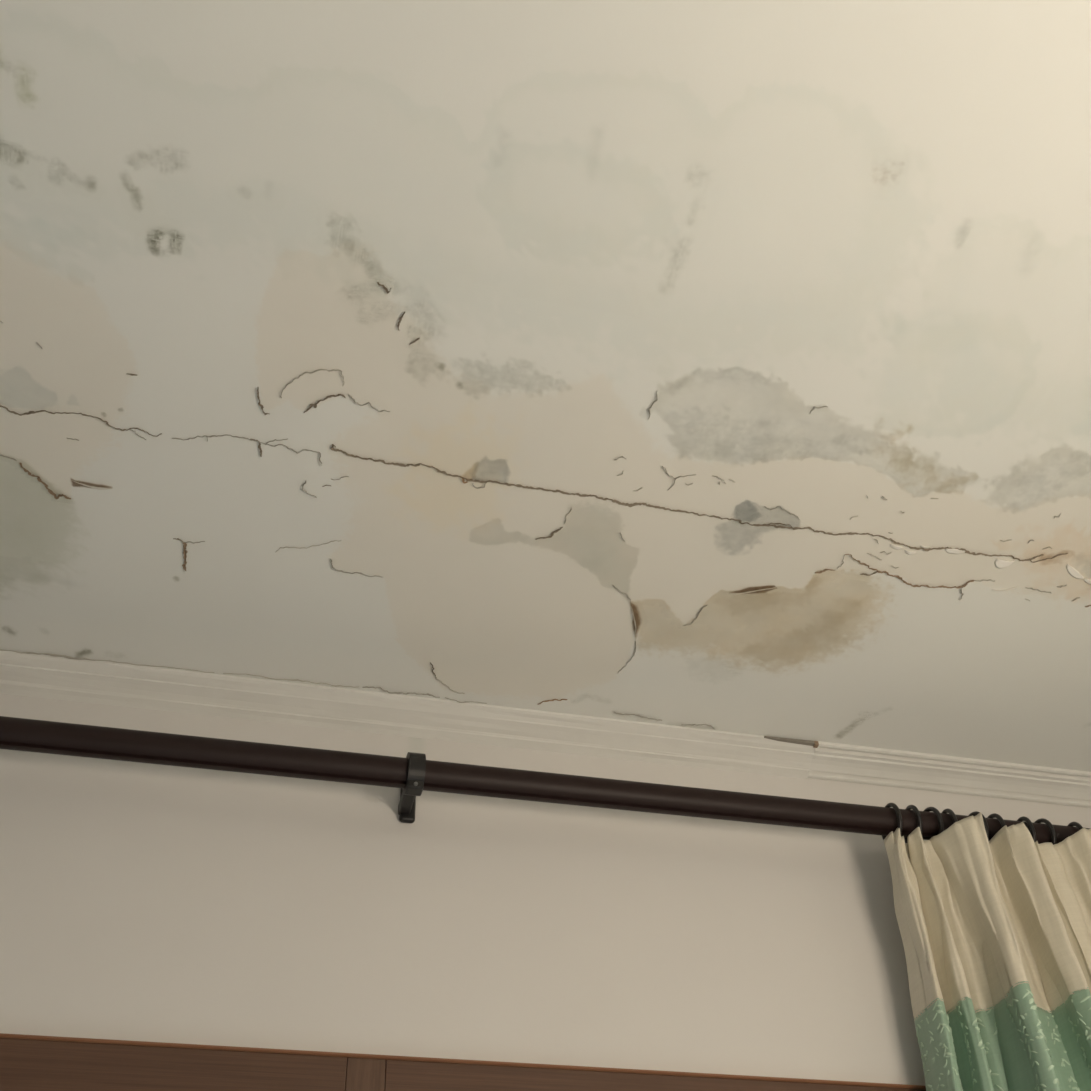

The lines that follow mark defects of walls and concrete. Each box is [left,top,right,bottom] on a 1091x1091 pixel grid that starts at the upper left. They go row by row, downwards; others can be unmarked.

crack [0,405,1091,607]